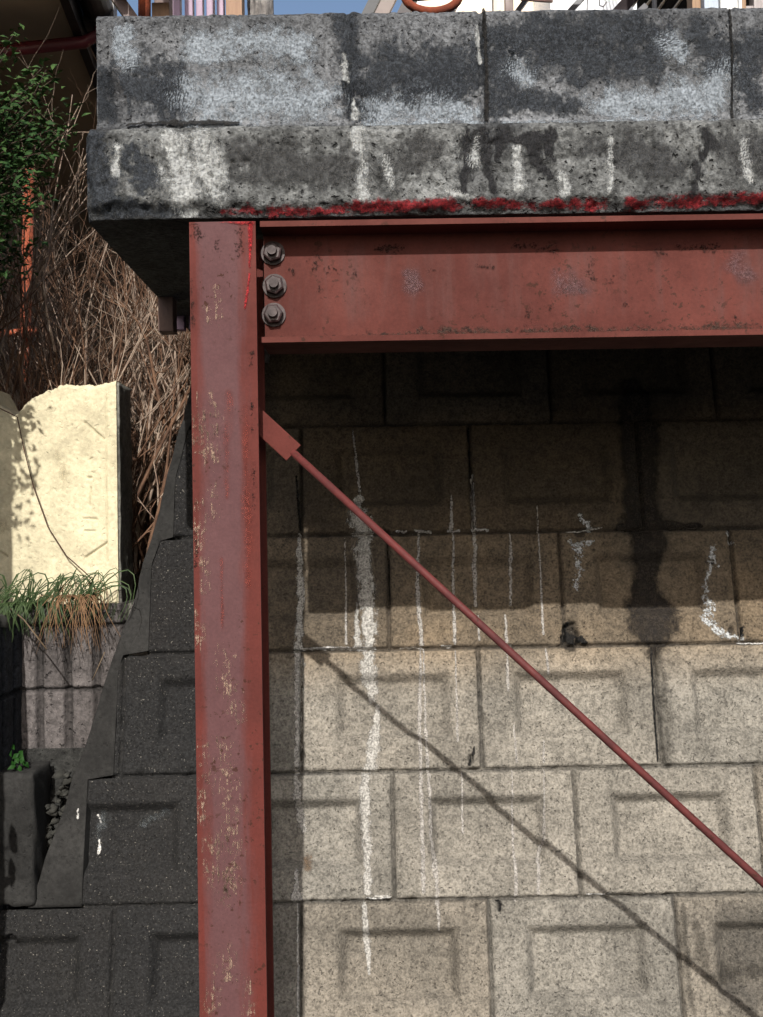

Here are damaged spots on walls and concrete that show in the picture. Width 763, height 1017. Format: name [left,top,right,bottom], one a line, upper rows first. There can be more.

leakage [112,144,120,177]
leakage [161,129,227,218]
leakage [350,126,370,203]
leakage [382,155,394,188]
leakage [449,124,571,200]
leakage [688,127,720,199]
leakage [740,139,753,182]
leakage [616,378,703,657]
efflorescence [441,474,489,742]
efflorescence [504,533,513,691]
efflorescence [293,430,391,974]
efflorescence [396,530,441,931]